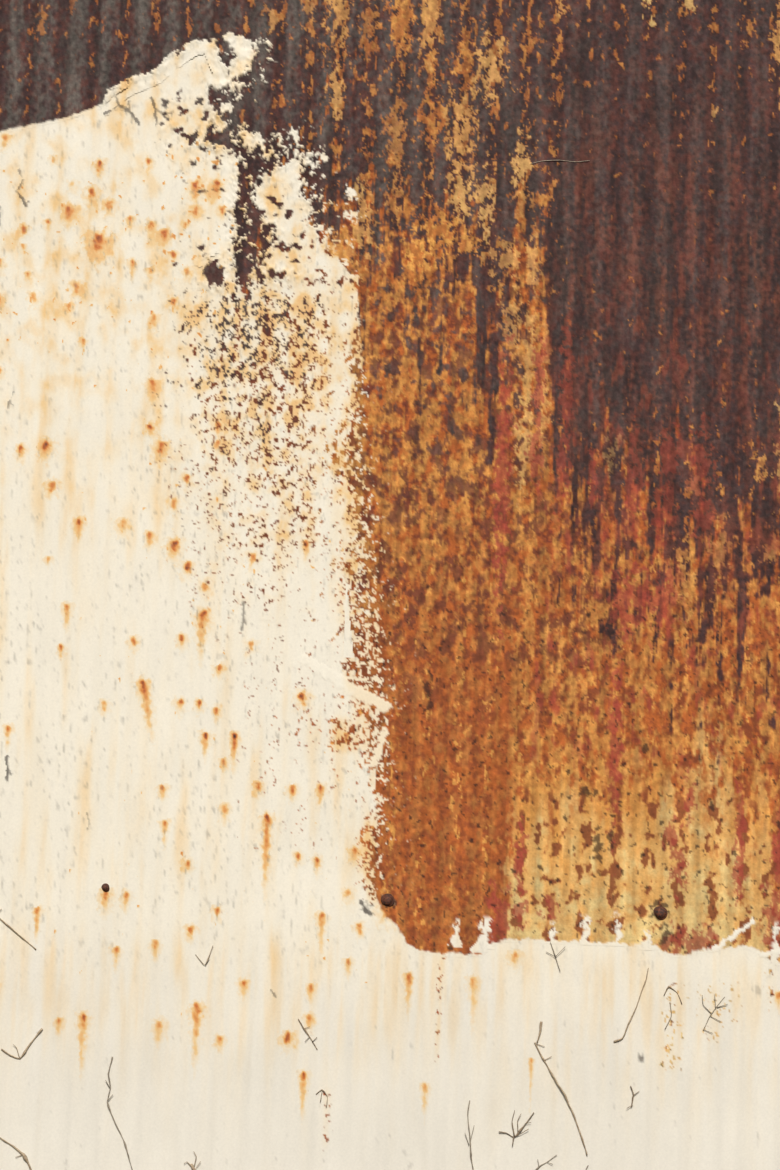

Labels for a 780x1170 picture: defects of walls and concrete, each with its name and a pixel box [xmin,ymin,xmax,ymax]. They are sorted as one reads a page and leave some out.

rust [0,0,780,610]
peeling [124,38,389,926]
rust [110,517,229,682]
rust [337,234,780,958]
rust [118,673,158,747]
rust [171,695,244,775]
rust [95,887,140,921]
rust [244,780,331,903]
peeling [507,752,780,966]
rust [52,1009,95,1081]
rust [149,998,228,1081]
rust [276,976,320,1058]